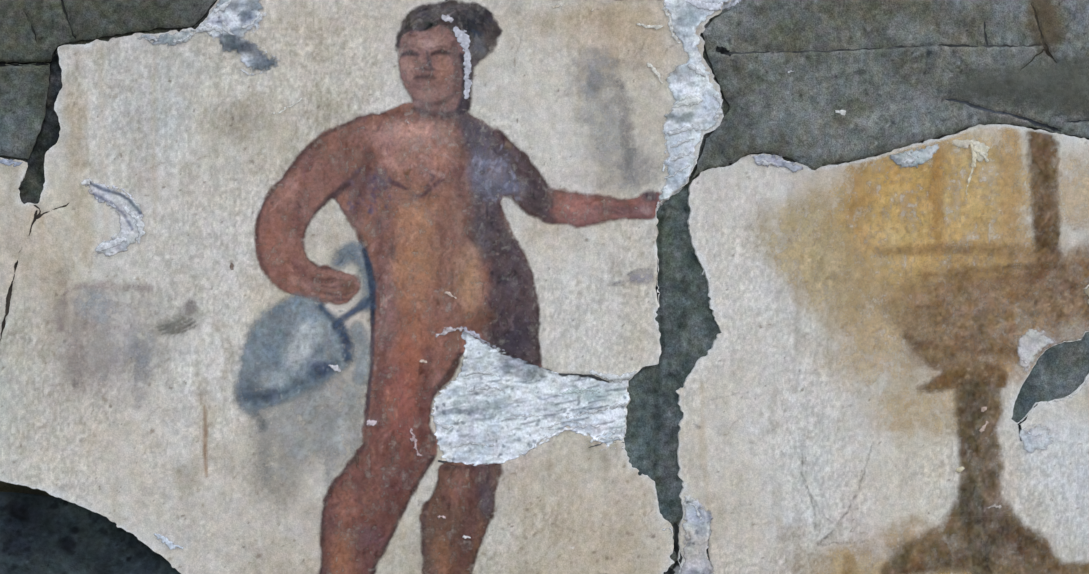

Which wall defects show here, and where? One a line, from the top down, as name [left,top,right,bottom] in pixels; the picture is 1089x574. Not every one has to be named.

flaking render [138,0,280,75]
crack [721,4,1057,69]
flaking render [0,53,63,204]
flaking render [753,153,803,172]
crack [945,98,1089,131]
flaking render [81,178,145,256]
crack [0,203,69,340]
flaking render [431,0,741,574]
flaking render [1011,329,1089,423]